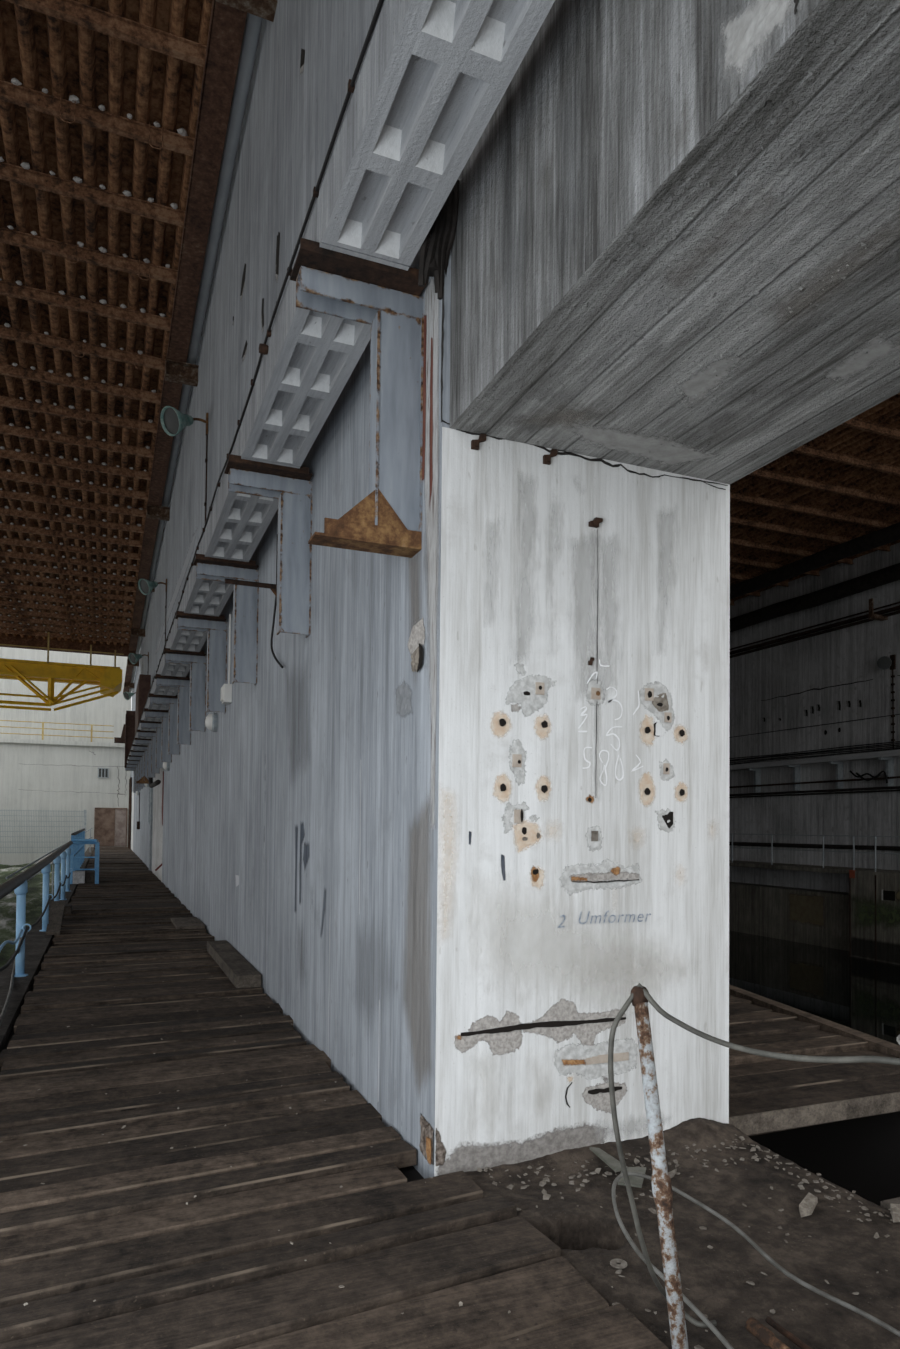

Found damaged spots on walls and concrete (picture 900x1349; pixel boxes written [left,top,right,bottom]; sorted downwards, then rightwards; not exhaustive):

spalling [408,618,425,672]
spalling [505,663,556,717]
spalling [639,681,675,737]
spalling [508,740,527,786]
peeling [502,801,541,852]
spalling [655,808,675,833]
spalling [559,826,642,896]
peeling [454,998,638,1113]
spalling [477,1159,617,1211]
spalling [668,1134,893,1239]